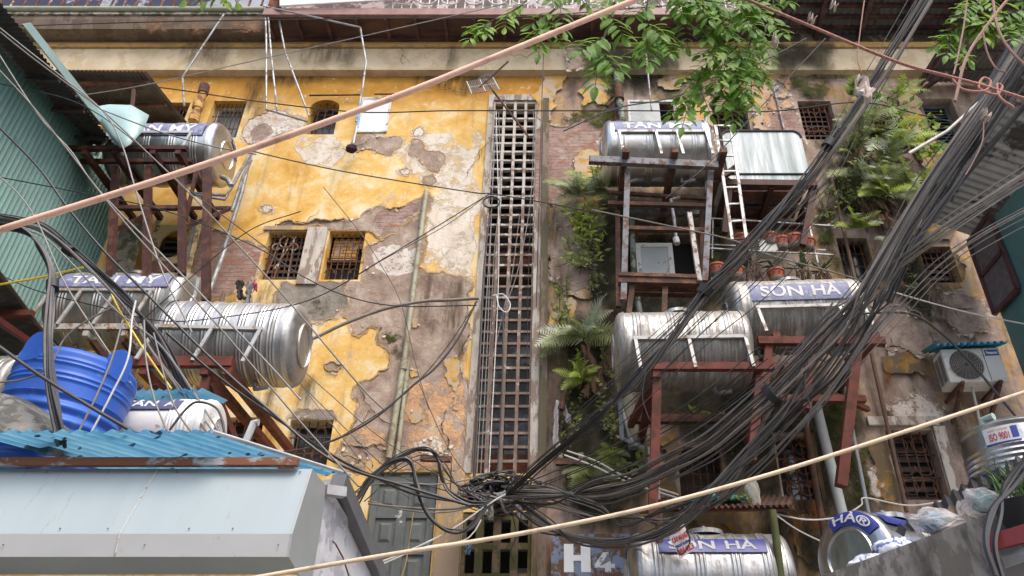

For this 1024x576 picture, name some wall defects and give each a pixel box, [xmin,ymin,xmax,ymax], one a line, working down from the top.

flaking render [240,106,306,144]
flaking render [259,125,476,476]